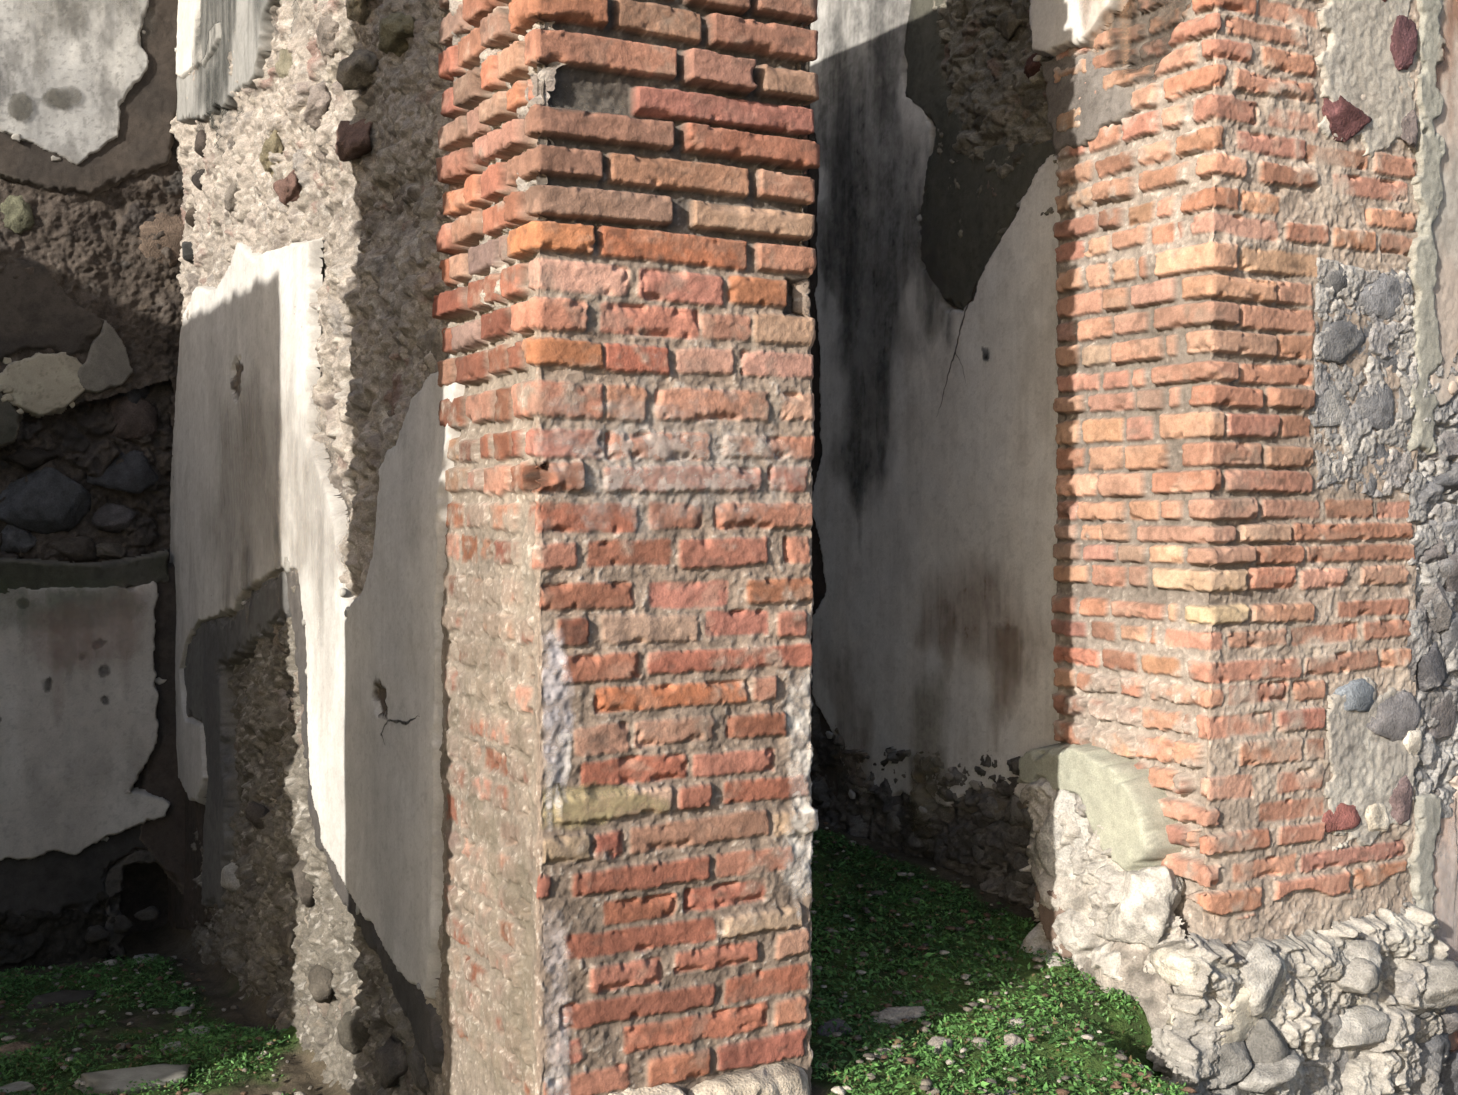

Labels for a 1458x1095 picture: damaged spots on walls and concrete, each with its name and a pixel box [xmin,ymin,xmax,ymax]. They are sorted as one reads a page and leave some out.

flaking render [8,88,81,142]
spalling [182,129,207,262]
flaking render [319,168,339,194]
water stain [812,0,924,501]
flaking render [231,363,244,397]
peeling [1448,376,1458,395]
spalling [0,352,174,563]
flaking render [272,668,307,751]
crack [381,715,420,744]
spalling [85,849,162,957]
flaking render [306,984,359,1020]